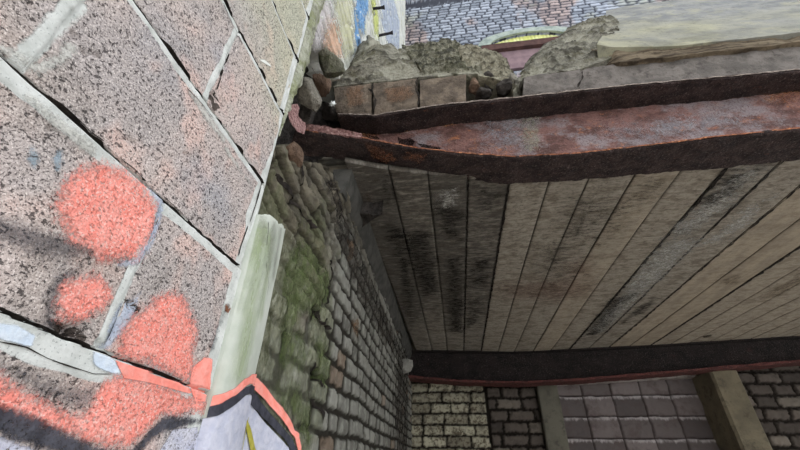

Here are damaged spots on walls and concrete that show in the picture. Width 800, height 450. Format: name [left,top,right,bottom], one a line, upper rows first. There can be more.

water stain [385,227,491,333]
crack [0,299,189,399]